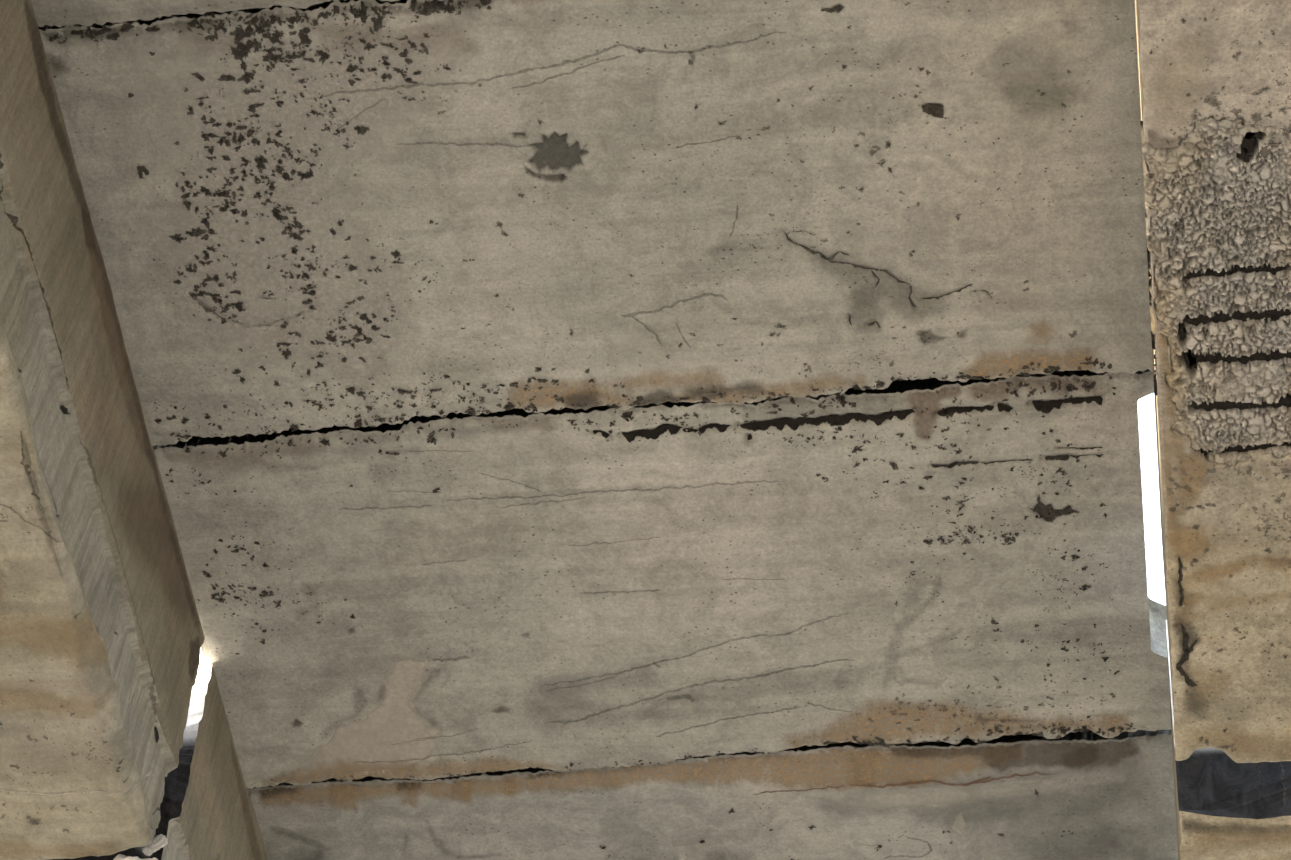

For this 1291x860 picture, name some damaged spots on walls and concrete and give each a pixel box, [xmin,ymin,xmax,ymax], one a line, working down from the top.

crack [785,231,992,307]
spalling [49,0,1136,748]
crack [593,396,1103,442]
crack [931,447,1103,468]
crack [1176,558,1197,687]
rust [794,704,1136,770]
rust [261,760,558,796]
crack [755,772,1052,795]